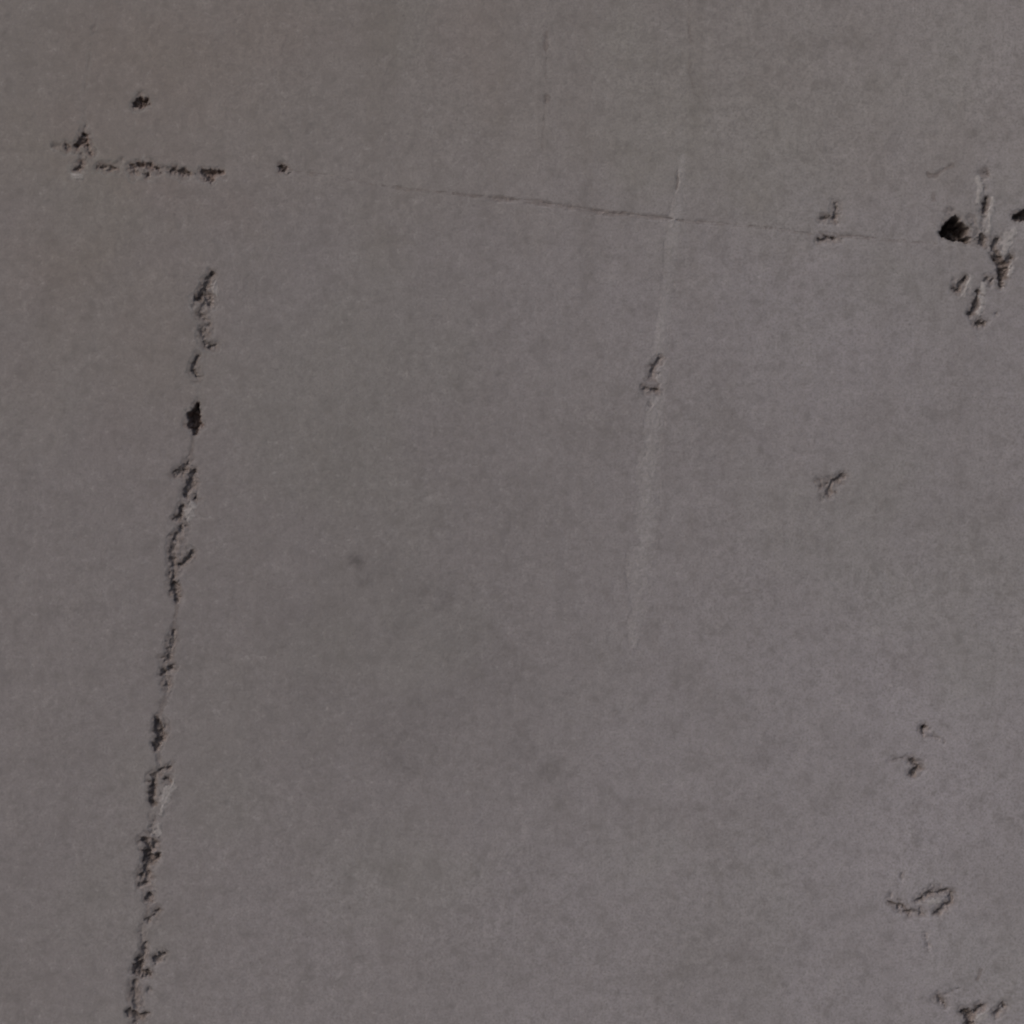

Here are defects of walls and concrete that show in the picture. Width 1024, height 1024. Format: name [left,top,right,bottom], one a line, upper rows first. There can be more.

crack [94,156,228,187]
crack [274,159,813,236]
crack [124,267,223,1024]